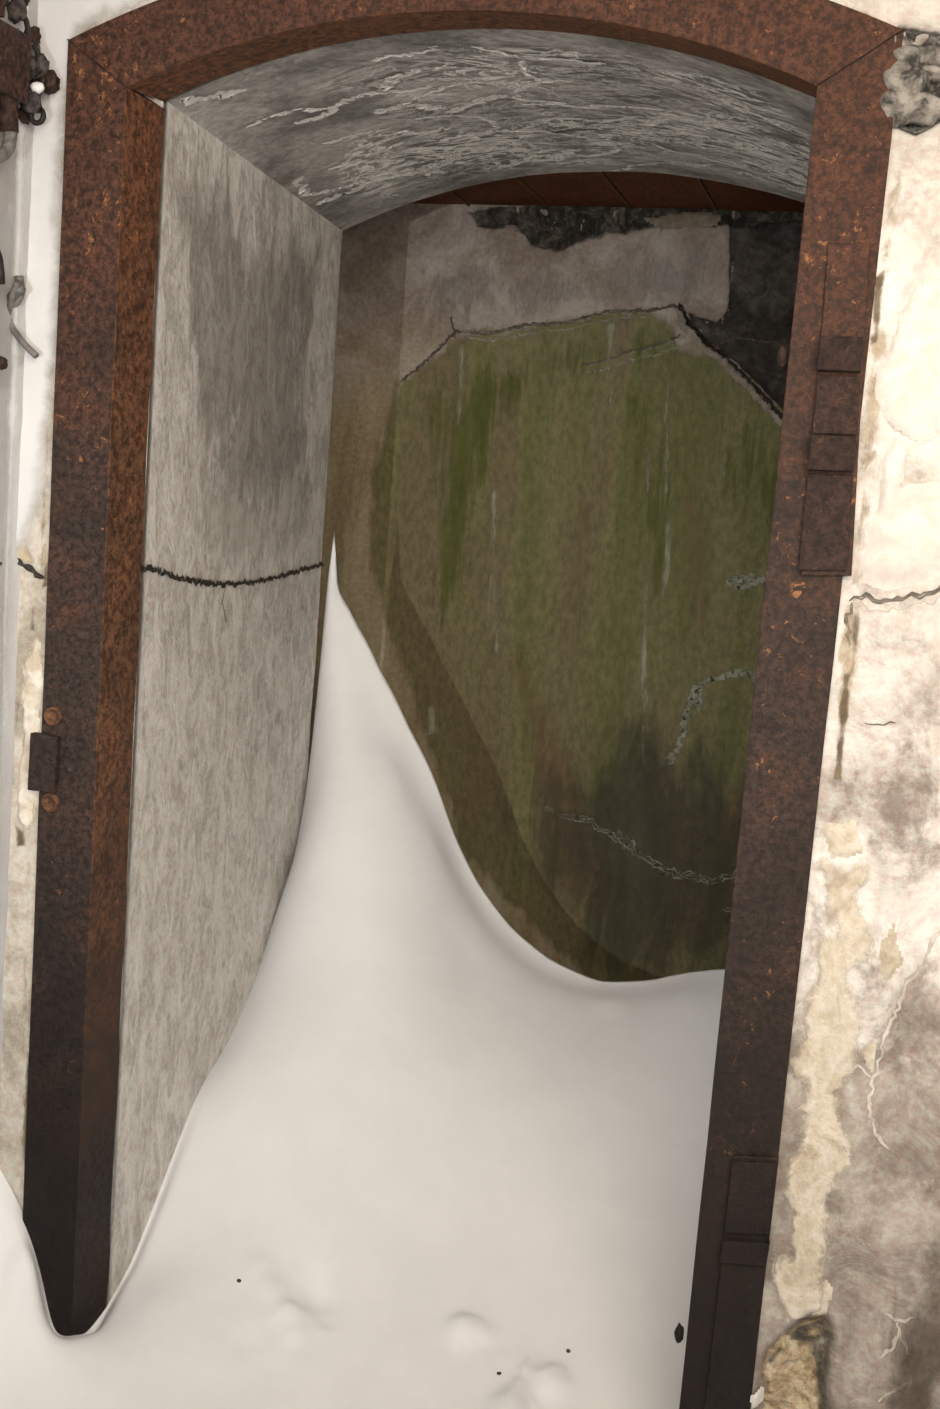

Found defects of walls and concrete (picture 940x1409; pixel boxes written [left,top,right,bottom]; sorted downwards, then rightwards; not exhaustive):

water stain [179,89,247,107]
water stain [245,45,811,205]
crack [400,302,790,427]
rust [872,273,883,342]
crack [0,541,46,579]
crack [140,562,325,623]
water stain [640,525,671,709]
rust [835,674,849,779]
water stain [544,668,756,973]
water stain [854,931,940,1149]
peeling [750,819,904,1409]
water stain [878,1301,940,1409]